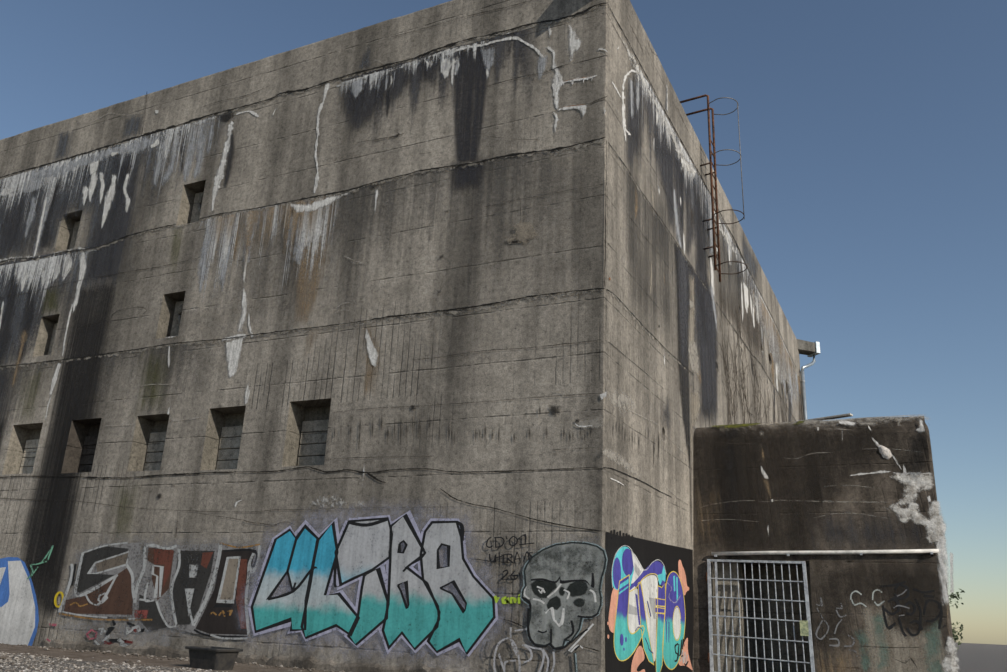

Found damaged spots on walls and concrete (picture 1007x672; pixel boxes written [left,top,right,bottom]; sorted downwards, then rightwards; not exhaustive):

water stain [0,113,215,613]
crack [0,448,671,538]
water stain [199,26,597,377]
water stain [598,42,937,551]
water stain [820,563,950,649]